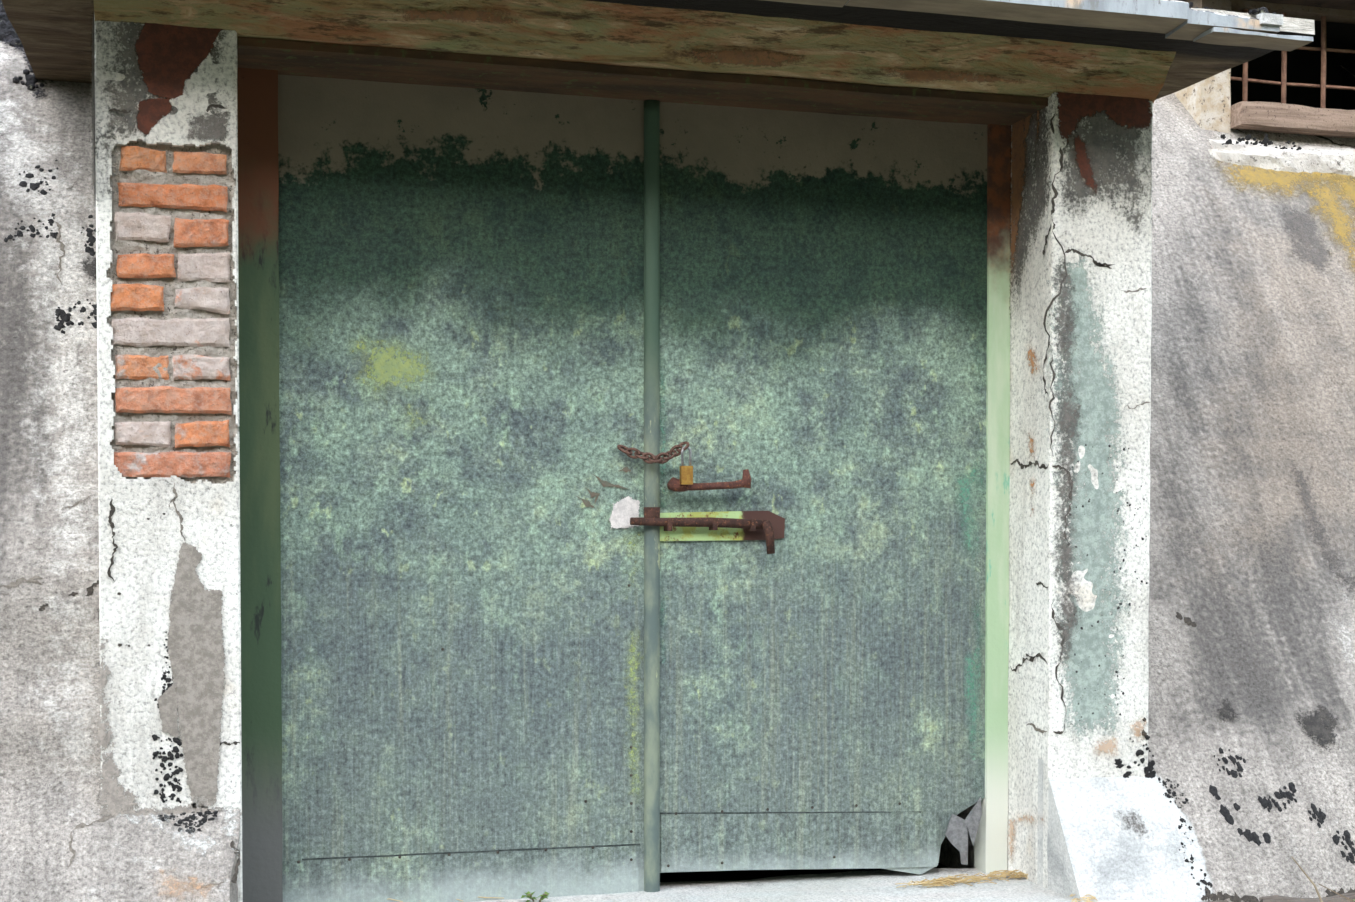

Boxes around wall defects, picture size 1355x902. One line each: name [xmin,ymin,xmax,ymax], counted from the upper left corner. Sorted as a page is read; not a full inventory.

spalling [107,23,238,484]
crack [1011,111,1146,542]
water stain [1279,210,1331,271]
peeling [90,542,243,854]
crack [169,483,185,541]
crack [1010,582,1066,734]